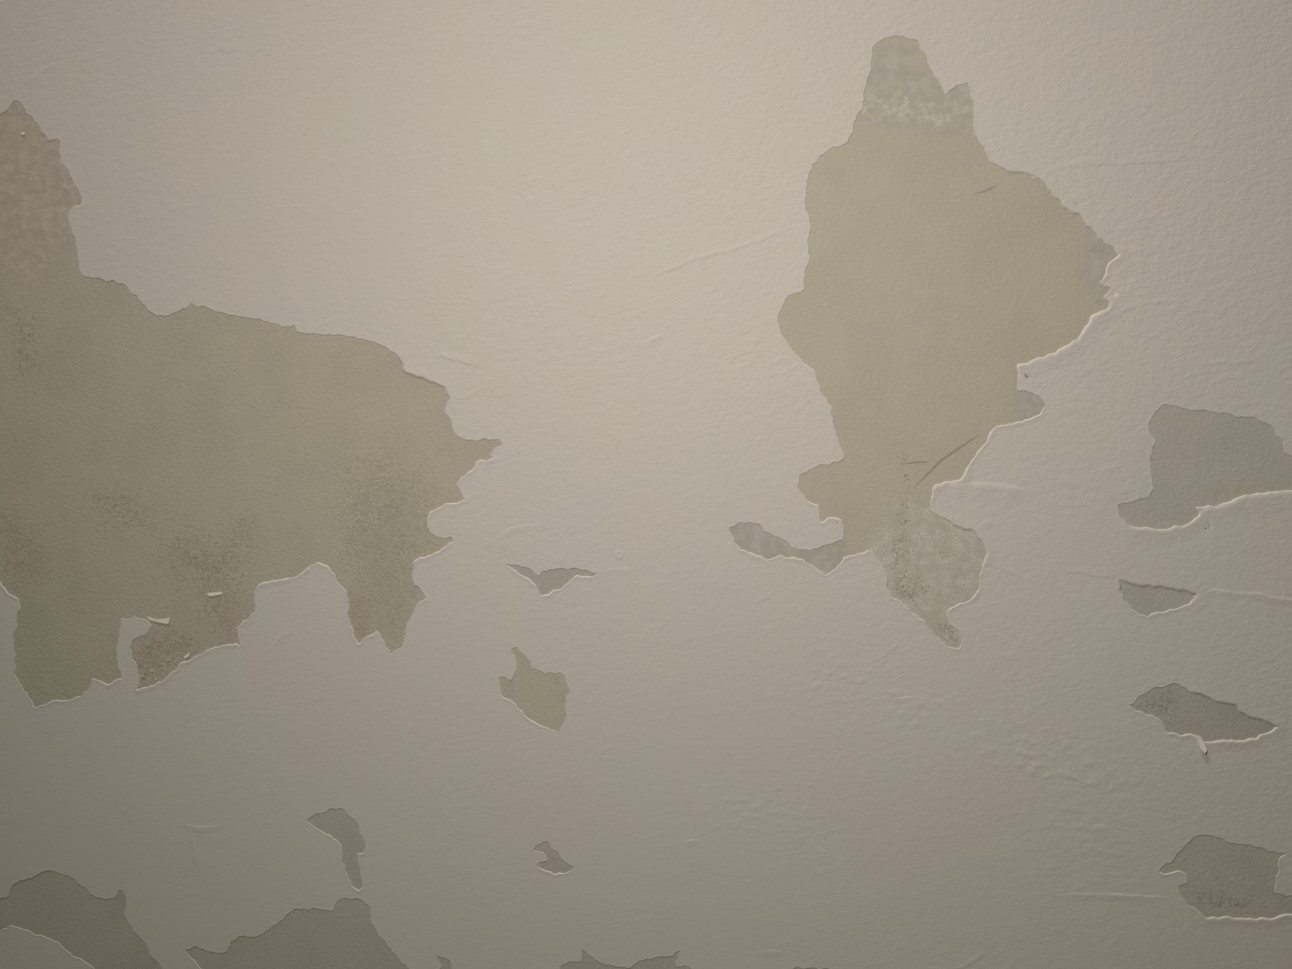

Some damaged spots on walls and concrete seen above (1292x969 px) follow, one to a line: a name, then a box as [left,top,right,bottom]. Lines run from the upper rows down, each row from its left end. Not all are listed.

peeling [727,33,1132,654]
peeling [0,99,504,711]
peeling [1114,402,1292,546]
peeling [502,561,600,600]
peeling [1106,567,1211,620]
peeling [497,646,572,735]
peeling [1125,681,1288,753]
peeling [0,869,163,969]
peeling [182,807,413,969]
peeling [530,839,575,878]
peeling [559,948,693,969]
peeling [1155,833,1292,930]